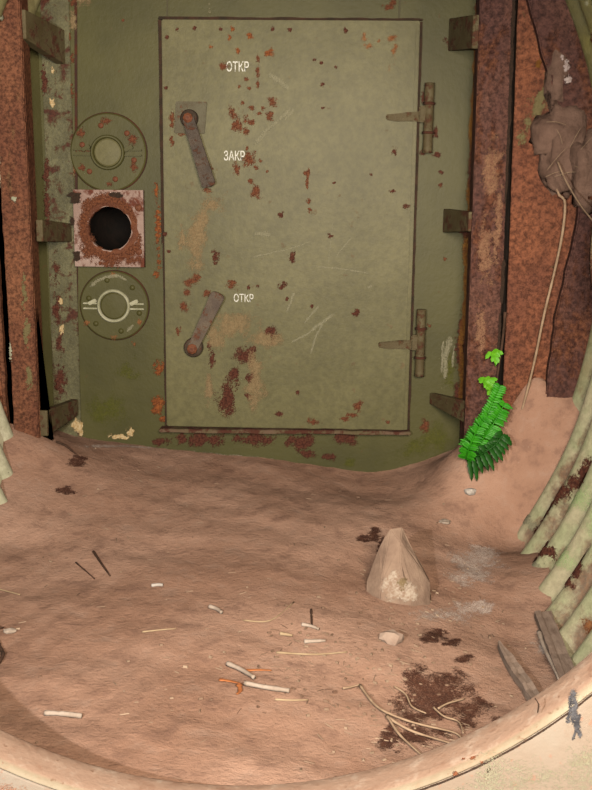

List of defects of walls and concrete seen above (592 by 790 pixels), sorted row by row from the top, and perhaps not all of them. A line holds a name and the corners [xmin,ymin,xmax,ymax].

rust [238,47,275,90]
rust [228,97,278,199]
rust [77,182,143,275]
rust [153,182,171,279]
rust [453,49,506,399]
rust [51,249,68,403]
rust [213,344,258,418]
rust [152,418,336,462]
rust [532,457,592,535]
rust [532,540,558,563]
rust [565,551,592,590]